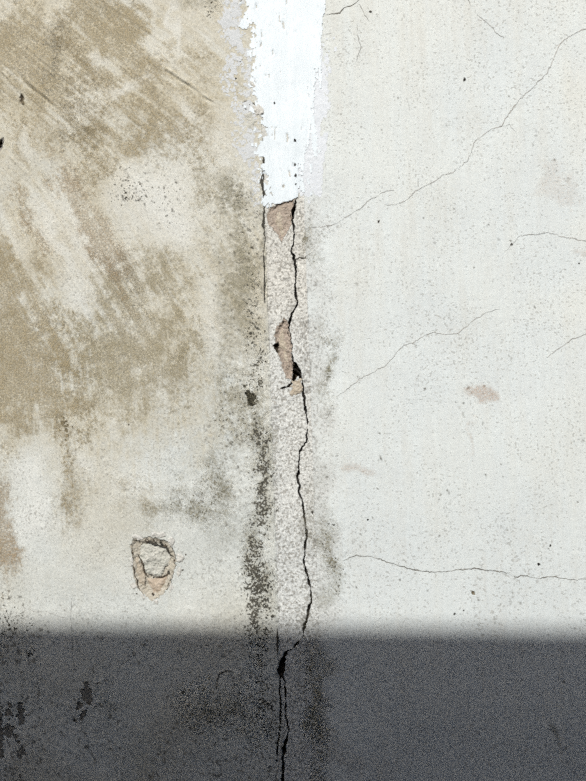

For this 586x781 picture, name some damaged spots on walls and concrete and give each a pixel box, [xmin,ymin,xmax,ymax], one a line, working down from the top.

damp [0,0,151,116]
crack [253,141,266,301]
spalling [267,198,296,242]
damp [0,237,183,436]
spalling [273,318,303,396]
crack [274,29,585,781]
peeling [131,531,186,571]
damp [162,284,283,779]